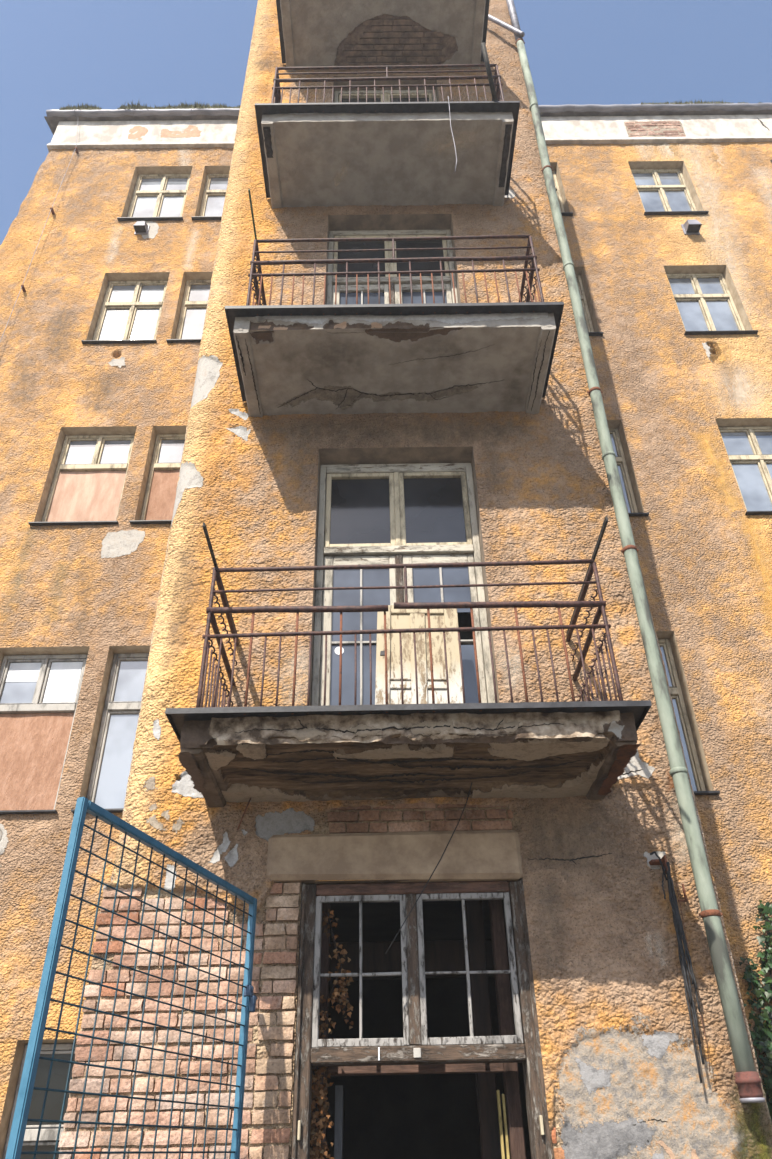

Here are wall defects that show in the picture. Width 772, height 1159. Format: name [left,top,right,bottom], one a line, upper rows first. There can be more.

flaking render [334,14,458,70]
flaking render [624,121,686,137]
peeling [248,313,548,344]
flaking render [190,355,223,409]
crack [236,336,503,414]
crack [527,331,550,411]
flaking render [170,462,203,529]
flaking render [101,529,145,558]
flaking render [153,719,161,740]
flaking render [146,804,185,833]
spalling [171,713,655,868]
flaking render [552,1013,751,1159]